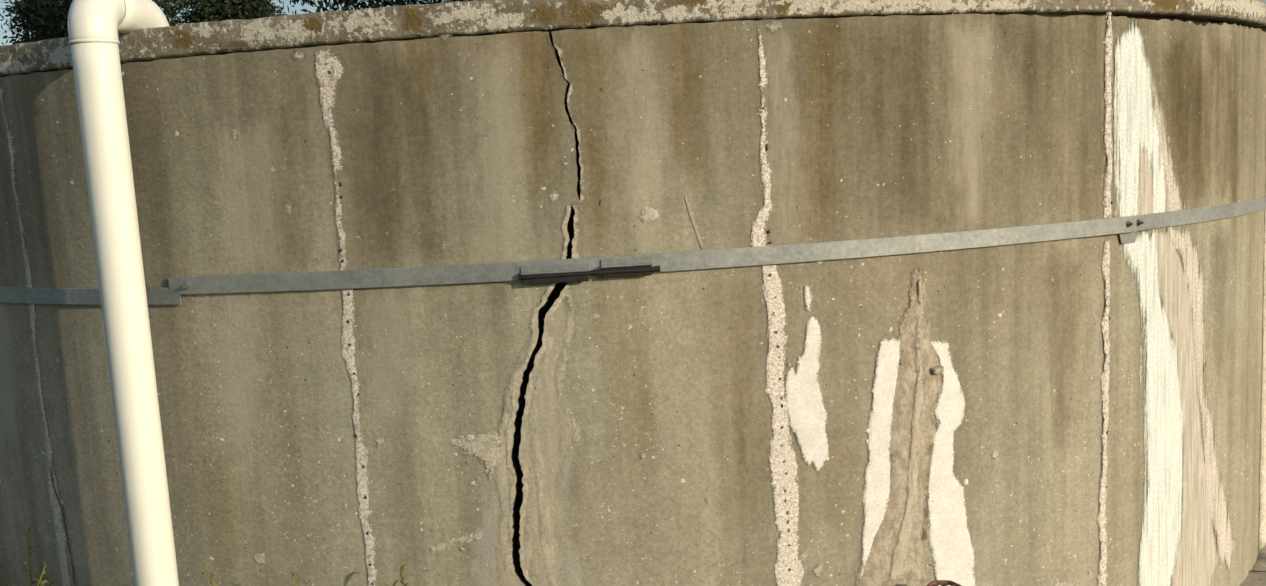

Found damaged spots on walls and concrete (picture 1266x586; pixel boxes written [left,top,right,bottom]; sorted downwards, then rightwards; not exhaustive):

water stain [0,78,33,288]
water stain [0,303,72,586]
water stain [313,49,347,270]
crack [504,30,587,586]
water stain [759,264,805,586]
water stain [749,19,817,247]
water stain [1101,12,1189,218]
water stain [1097,226,1235,586]